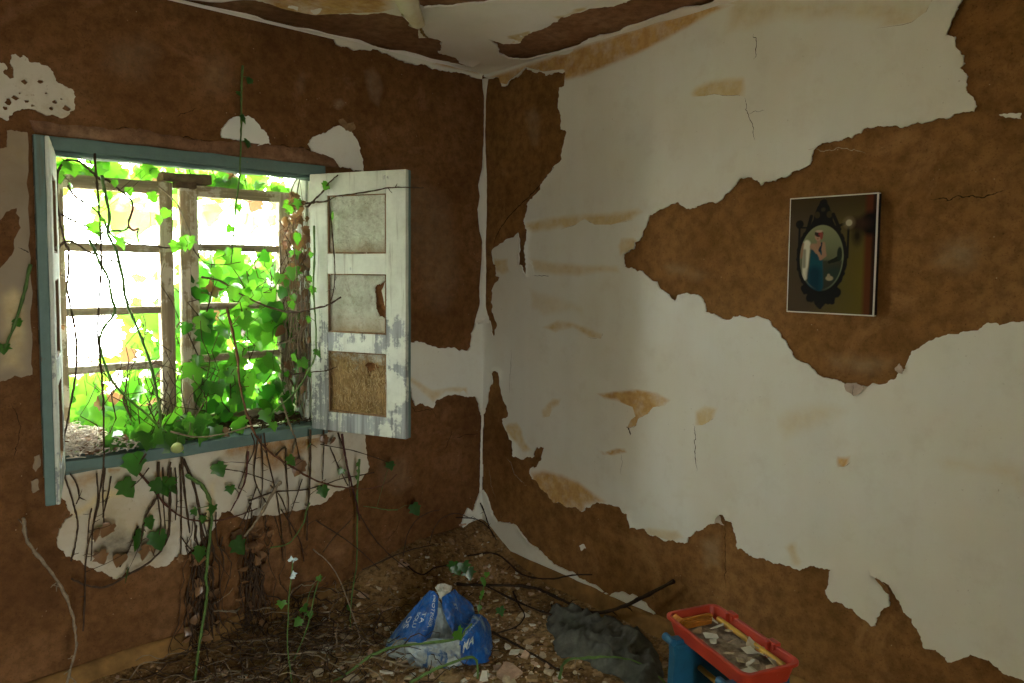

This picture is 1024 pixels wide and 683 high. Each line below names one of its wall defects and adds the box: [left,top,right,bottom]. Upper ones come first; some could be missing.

flaking render [172,0,267,21]
flaking render [307,0,1024,683]